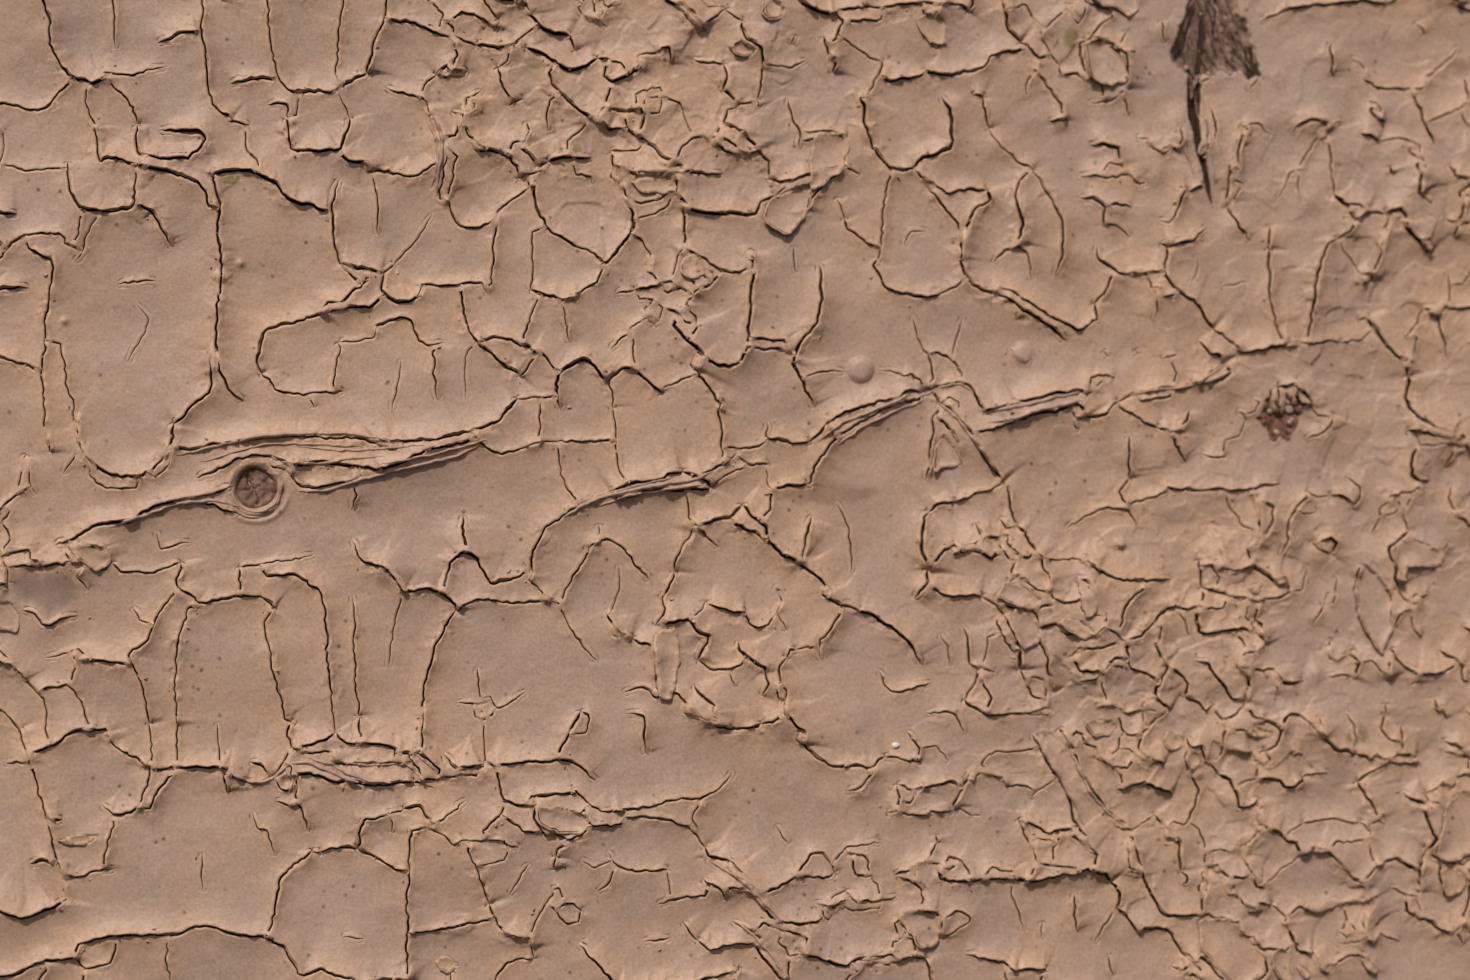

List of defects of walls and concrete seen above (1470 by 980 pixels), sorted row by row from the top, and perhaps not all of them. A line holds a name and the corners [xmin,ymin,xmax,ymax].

crack [106,0,121,50]
peeling [1085,38,1129,86]
peeling [1096,0,1140,17]
crack [1157,20,1169,43]
peeling [1170,0,1263,99]
crack [1258,0,1427,37]
crack [1451,0,1470,16]
crack [0,76,102,176]
crack [251,0,1136,412]
crack [992,41,1470,980]
crack [0,99,1156,980]